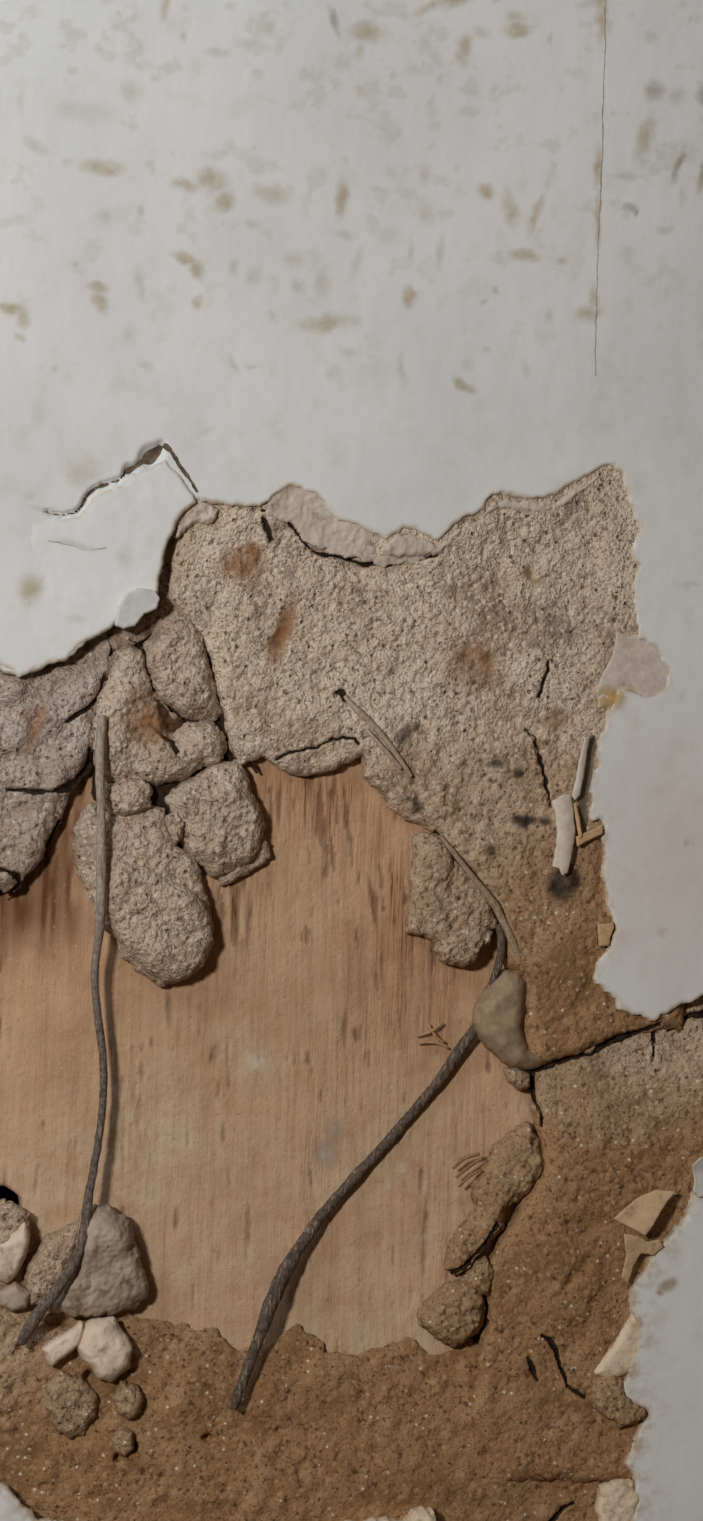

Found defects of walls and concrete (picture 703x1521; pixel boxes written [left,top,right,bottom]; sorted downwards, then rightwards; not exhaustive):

crack [594,0,606,376]
crack [46,443,198,550]
crack [261,509,438,567]
crack [7,639,360,847]
crack [526,661,551,808]
crack [0,867,22,896]
spalling [0,465,703,1521]
crack [524,1010,703,1127]
crack [527,1334,585,1399]